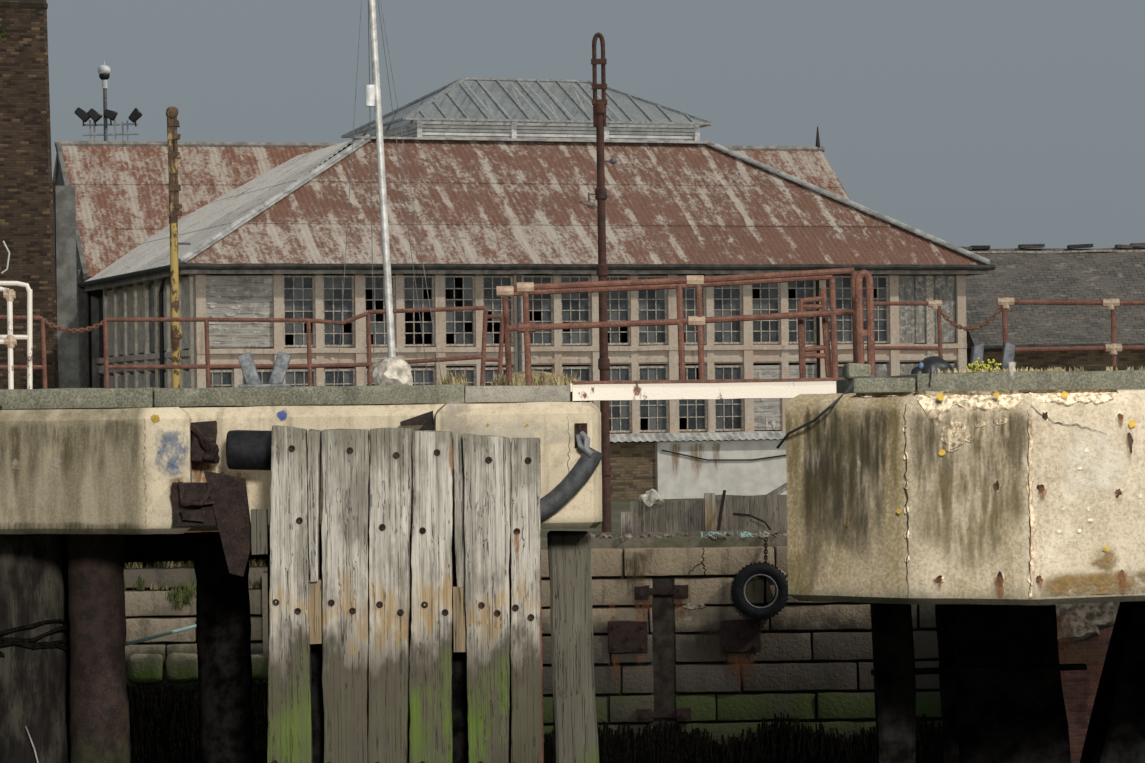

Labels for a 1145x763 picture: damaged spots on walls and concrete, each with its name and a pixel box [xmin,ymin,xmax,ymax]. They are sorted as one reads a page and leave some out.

leakage [158,432,187,474]
leakage [787,410,898,542]
crack [902,403,910,593]
leakage [915,417,998,553]
spalling [856,389,1123,452]
leakage [1002,416,1025,467]